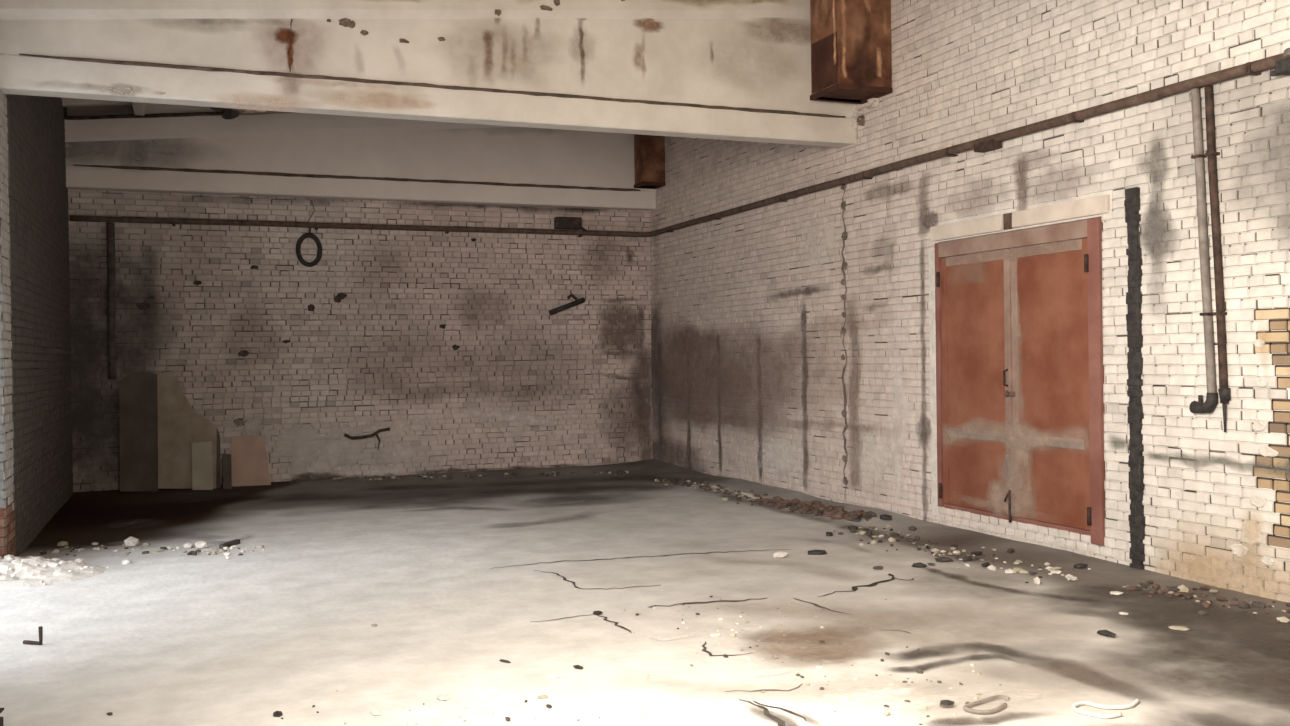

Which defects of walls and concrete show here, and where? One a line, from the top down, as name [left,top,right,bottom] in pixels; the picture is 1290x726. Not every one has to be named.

corrosion [276,29,295,65]
leakage [1144,144,1169,264]
leakage [757,339,795,478]
crack [840,189,848,500]
leakage [849,320,882,486]
flaking render [1230,308,1290,566]
crack [491,549,914,632]